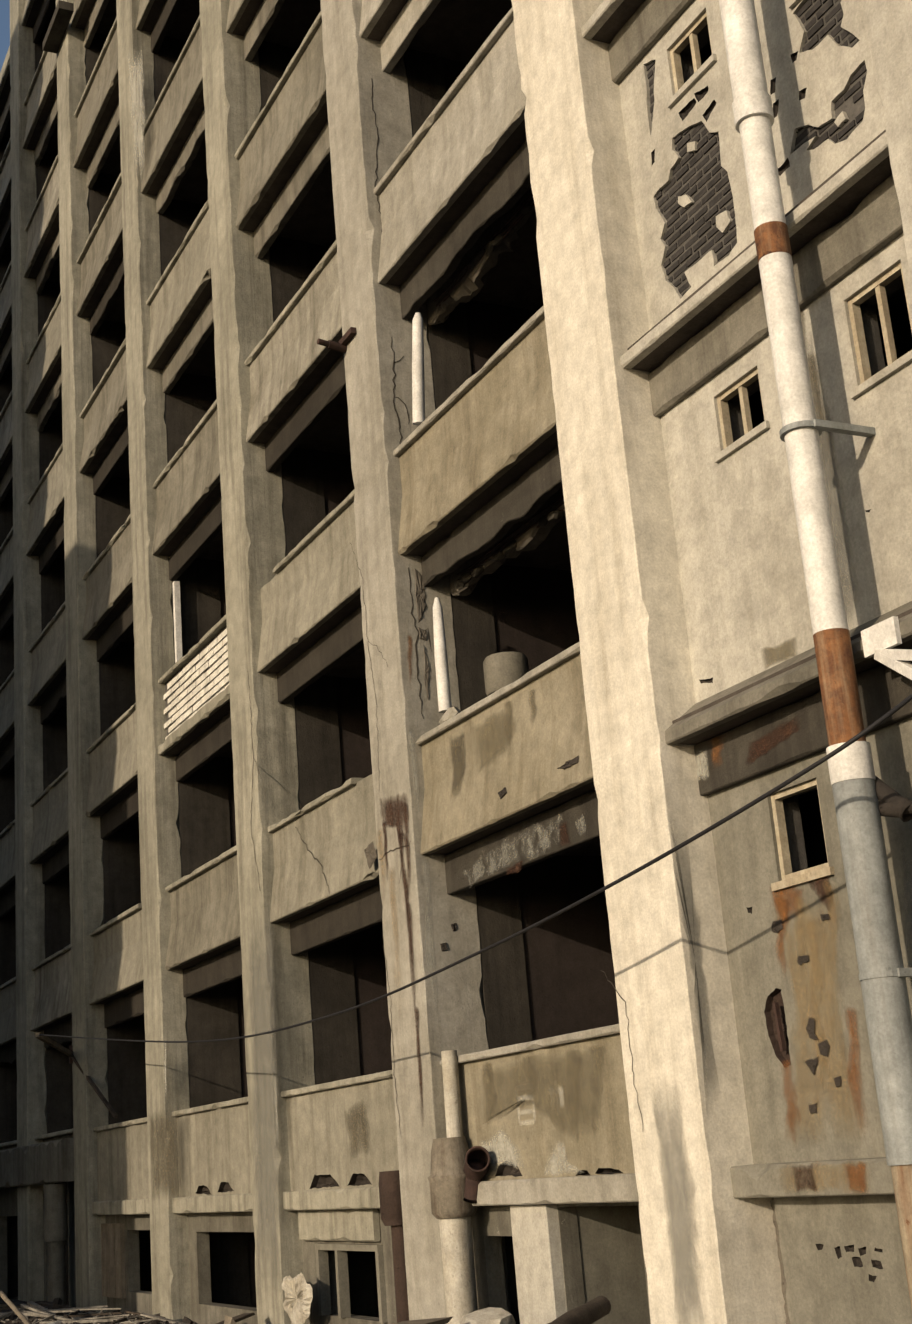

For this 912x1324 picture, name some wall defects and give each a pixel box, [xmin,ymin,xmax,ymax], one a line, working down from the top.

flaking render [791,0,859,63]
spalling [770,77,779,118]
flaking render [778,64,867,176]
flaking render [656,86,737,297]
crack [391,337,409,443]
crack [350,543,432,774]
peeling [464,815,585,881]
corrosion [382,797,423,1107]
corrosion [773,877,832,958]
spalling [764,988,831,1075]
spalling [816,1244,883,1282]